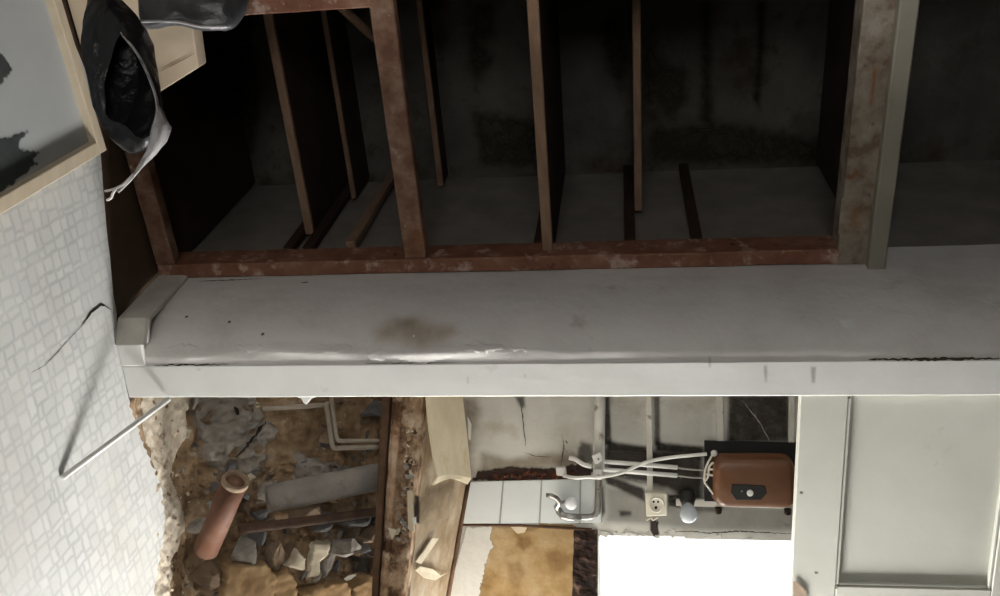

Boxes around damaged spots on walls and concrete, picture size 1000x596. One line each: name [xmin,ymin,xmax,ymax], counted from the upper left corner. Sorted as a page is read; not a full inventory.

rust [838,196,872,238]
leakage [359,306,472,364]
peeling [379,397,425,596]
flaking render [282,547,306,571]
flaking render [320,547,336,579]